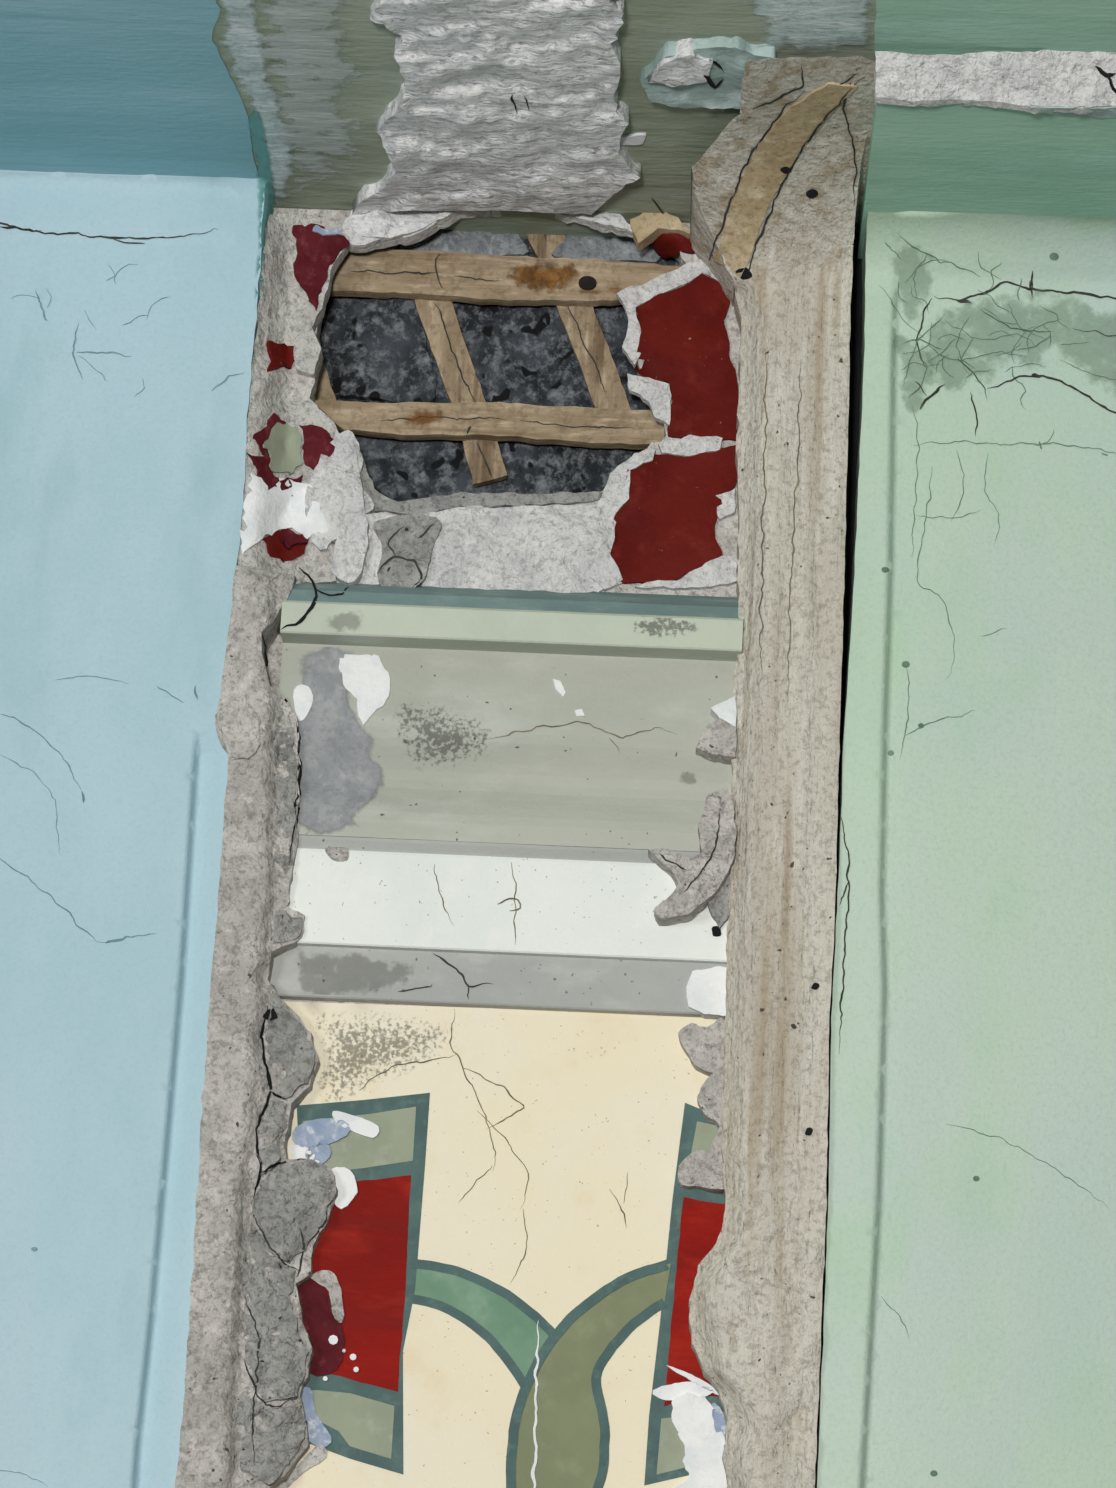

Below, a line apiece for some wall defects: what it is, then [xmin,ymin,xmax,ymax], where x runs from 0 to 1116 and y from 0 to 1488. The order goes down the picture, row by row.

spalling [640,0,1116,119]
crack [0,222,215,282]
peeling [736,267,752,280]
crack [12,290,166,396]
crack [839,236,1116,771]
crack [1,714,85,854]
crack [57,675,198,702]
spalling [175,0,738,1488]
crack [492,721,673,751]
crack [0,859,156,943]
crack [360,862,529,1282]